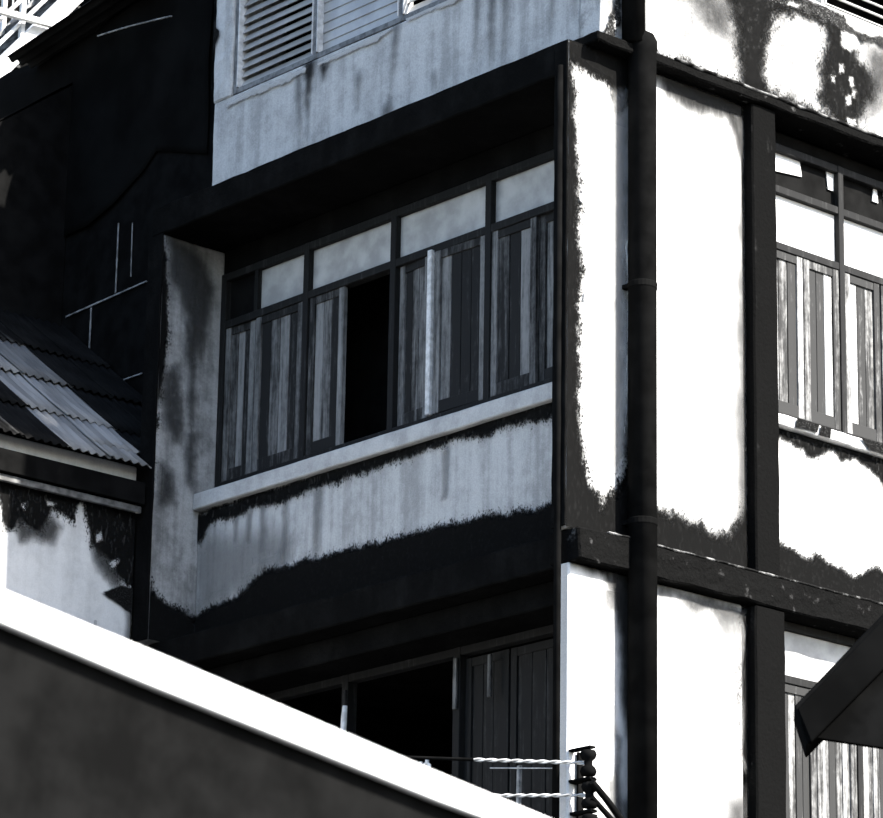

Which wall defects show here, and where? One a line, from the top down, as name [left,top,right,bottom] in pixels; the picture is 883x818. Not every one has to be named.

water stain [298,60,326,105]
water stain [657,0,883,136]
water stain [156,234,213,486]
water stain [566,39,628,536]
water stain [0,471,136,588]
water stain [148,402,554,642]
water stain [779,428,883,603]